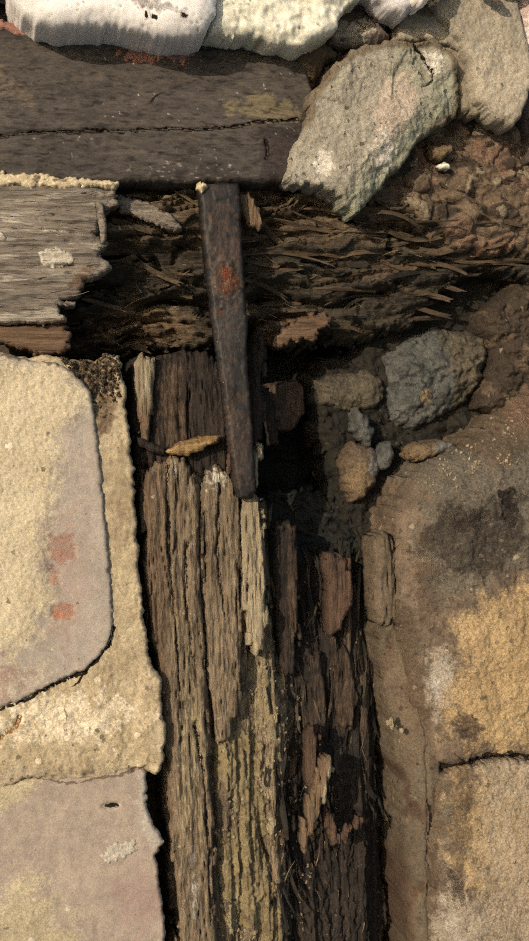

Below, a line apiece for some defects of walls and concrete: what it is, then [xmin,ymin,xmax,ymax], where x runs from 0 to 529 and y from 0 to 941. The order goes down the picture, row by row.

crack [413,43,434,87]
crack [0,117,299,160]
crack [439,750,529,768]